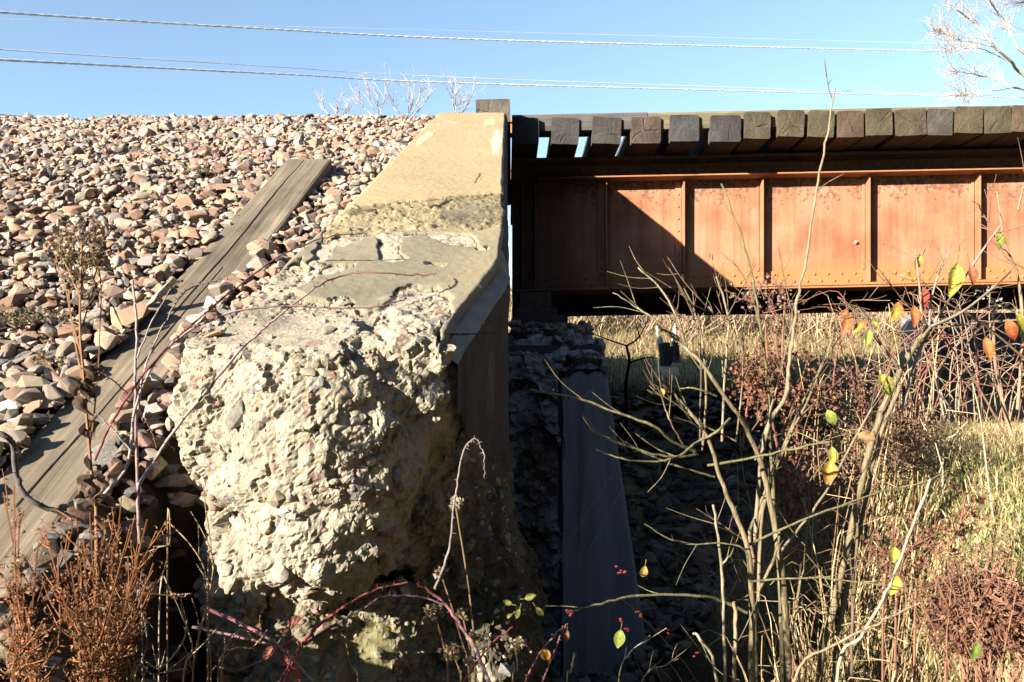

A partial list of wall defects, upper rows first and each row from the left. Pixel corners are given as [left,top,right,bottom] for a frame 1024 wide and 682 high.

spalling [165,232,610,682]
crack [325,259,457,327]